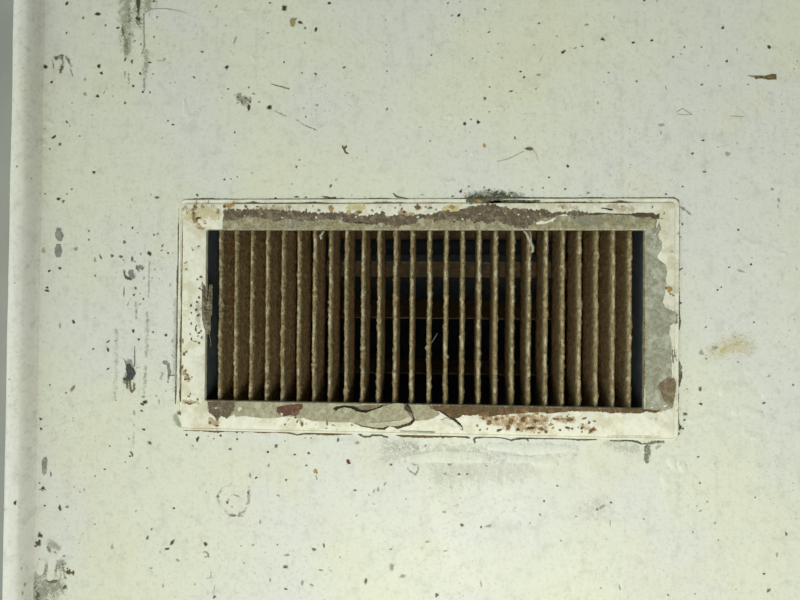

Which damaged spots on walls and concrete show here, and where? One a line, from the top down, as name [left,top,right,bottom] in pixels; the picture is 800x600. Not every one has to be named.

corrosion [305,203,381,215]
corrosion [394,199,482,216]
peeling [222,203,677,413]
peeling [207,401,439,430]
corrosion [429,405,660,434]